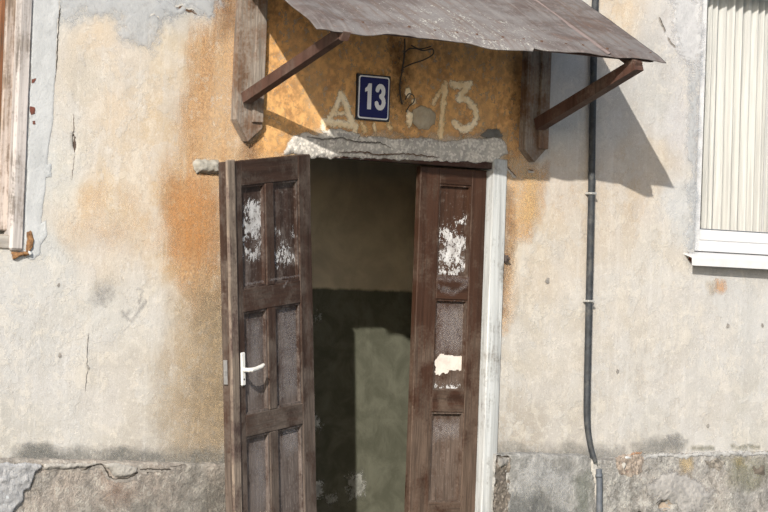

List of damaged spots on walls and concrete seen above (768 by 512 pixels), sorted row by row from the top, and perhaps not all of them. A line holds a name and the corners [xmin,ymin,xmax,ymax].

corrosion [166,0,236,303]
crack [307,136,439,158]
leakage [17,448,91,459]
peeling [0,462,137,512]
crack [81,463,187,483]
flaking render [493,455,511,512]
flaking render [615,452,644,477]